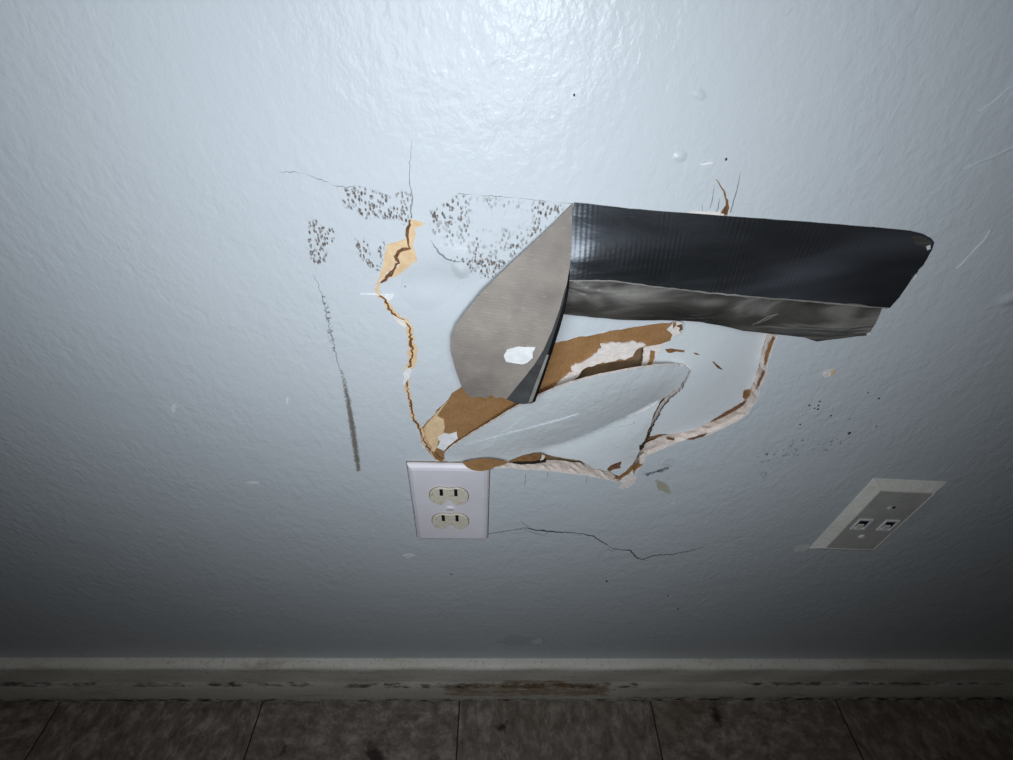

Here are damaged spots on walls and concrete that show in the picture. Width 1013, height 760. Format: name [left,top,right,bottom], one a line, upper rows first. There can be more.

peeling [375,219,425,285]
spalling [538,321,683,394]
spalling [419,387,519,461]
spalling [462,334,778,489]
crack [490,522,702,560]